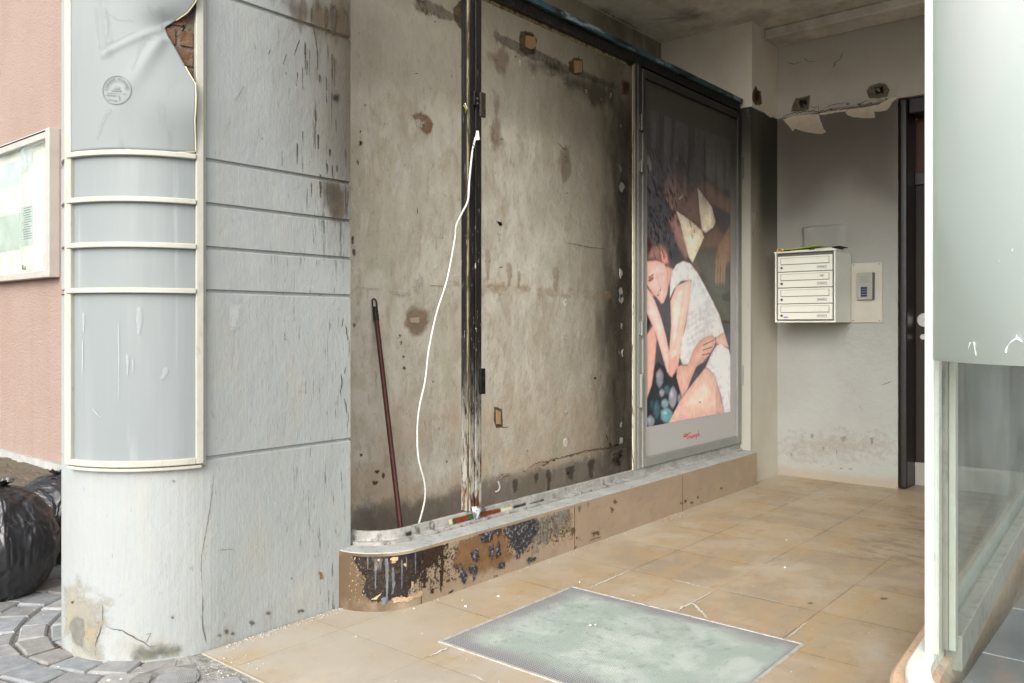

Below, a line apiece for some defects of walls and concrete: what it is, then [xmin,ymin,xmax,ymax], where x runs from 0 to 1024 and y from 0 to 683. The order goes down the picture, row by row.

flaking render [165,7,193,77]
peeling [752,83,897,134]
damp [481,450,628,507]
damp [353,492,465,531]
crack [201,475,214,643]
peeling [349,558,423,603]
crack [95,606,156,648]
damp [135,648,179,660]